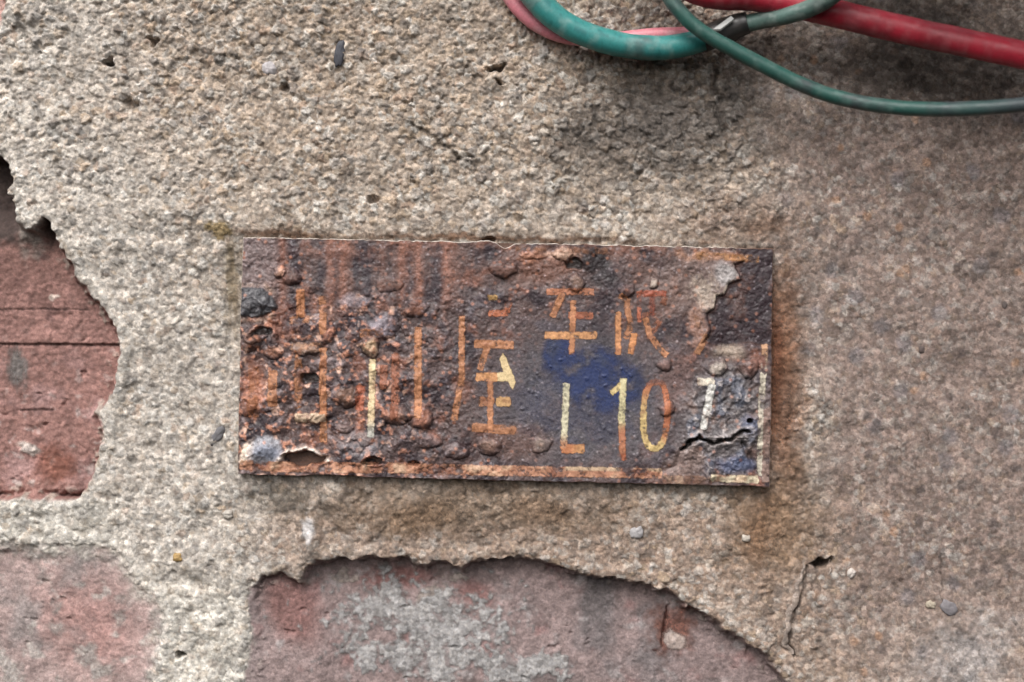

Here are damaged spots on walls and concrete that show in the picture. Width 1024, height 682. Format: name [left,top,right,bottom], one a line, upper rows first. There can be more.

rust [240,227,330,238]
rust [369,231,633,244]
spalling [0,236,121,503]
rust [770,291,800,467]
spalling [0,542,165,682]
spalling [244,554,787,682]
crack [788,566,808,650]